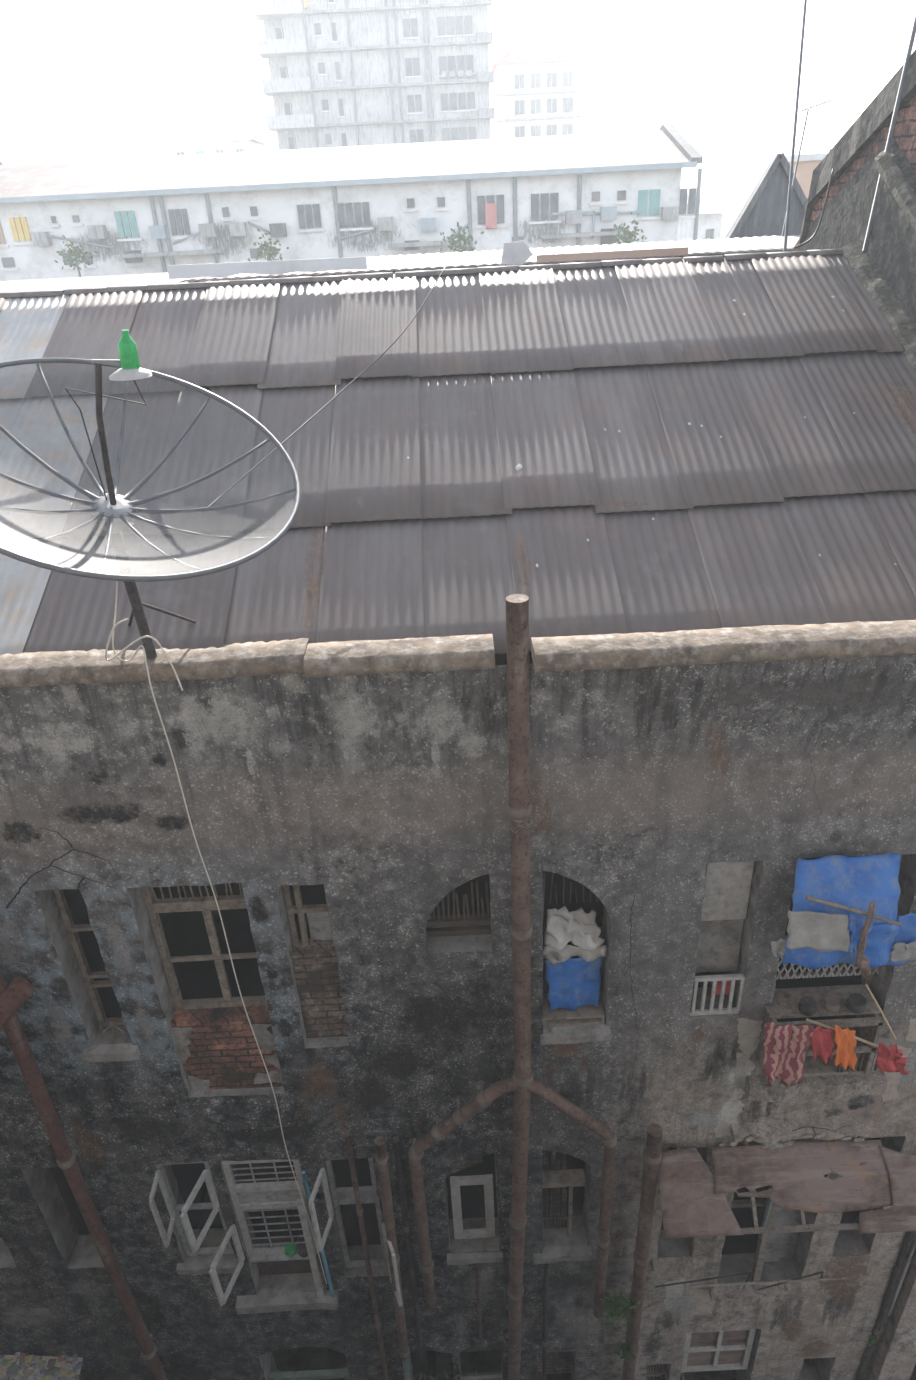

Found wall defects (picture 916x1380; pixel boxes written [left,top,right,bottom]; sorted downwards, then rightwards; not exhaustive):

water stain [41,711,140,774]
water stain [164,694,262,778]
water stain [276,690,381,775]
water stain [416,694,508,778]
water stain [3,820,40,847]
water stain [58,804,188,830]
peeling [250,896,267,923]
spalling [172,1027,210,1091]
spalling [251,1019,293,1084]